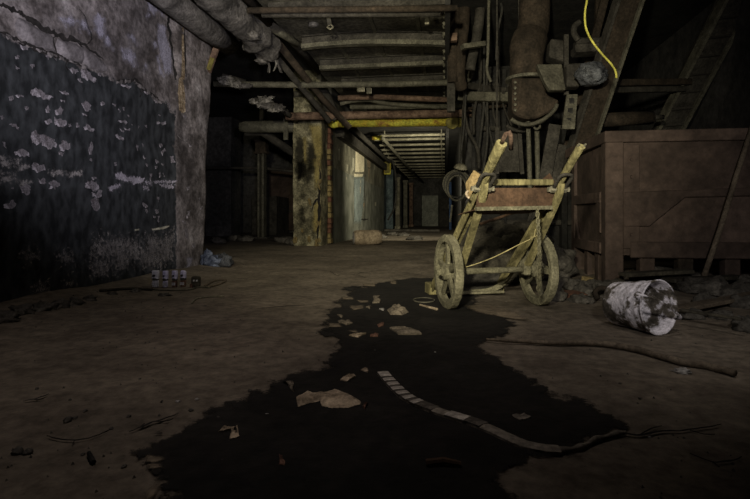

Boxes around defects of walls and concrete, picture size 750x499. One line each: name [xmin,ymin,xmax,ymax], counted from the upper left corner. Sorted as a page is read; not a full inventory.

crack [0,3,103,71]
leakage [153,24,171,76]
peeling [9,88,94,132]
peeling [100,101,147,140]
leakage [0,156,32,186]
peeling [2,142,60,189]
peeling [30,130,70,156]
peeling [85,177,102,211]
leakage [109,172,176,191]
peeling [136,143,175,182]
leakage [295,126,321,185]
leakage [89,226,180,277]